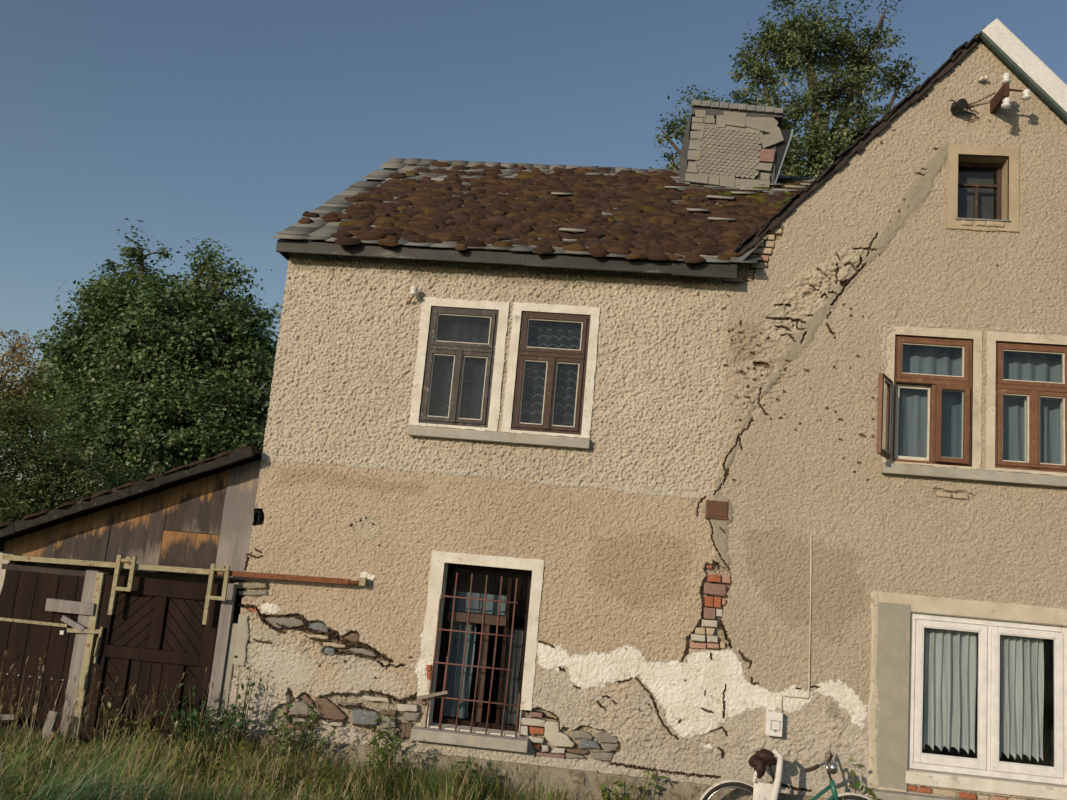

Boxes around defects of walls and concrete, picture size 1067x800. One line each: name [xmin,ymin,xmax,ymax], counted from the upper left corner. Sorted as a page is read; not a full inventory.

crack [767,232,878,344]
crack [697,387,767,570]
flaking render [234,579,393,679]
flaking render [684,562,731,655]
flaking render [270,690,428,742]
flaking render [520,707,623,762]